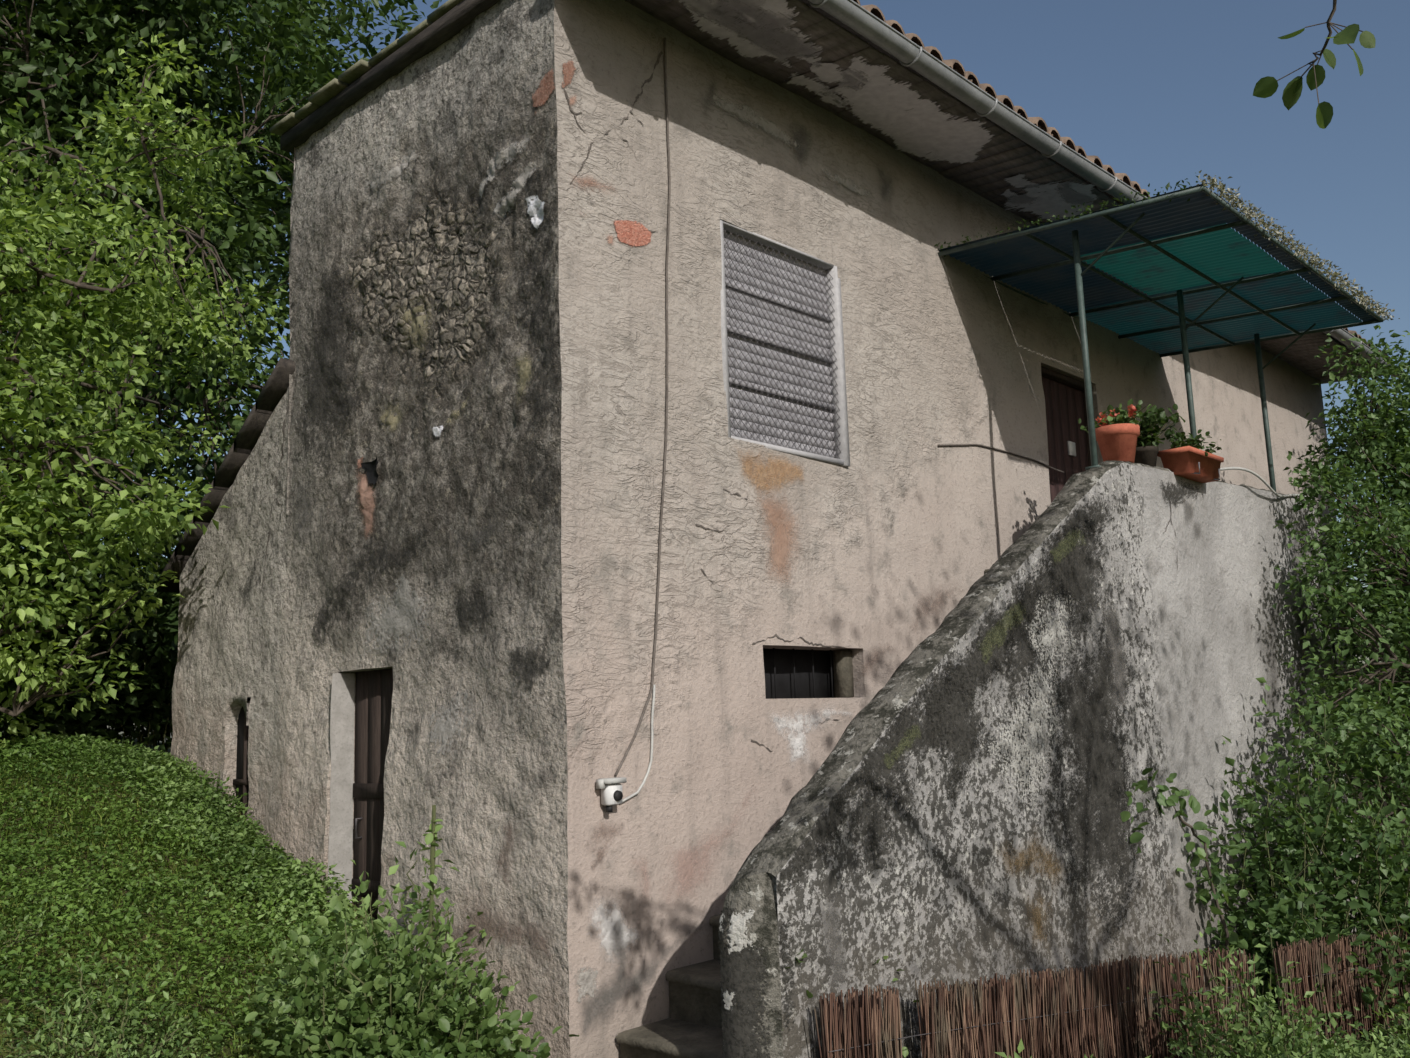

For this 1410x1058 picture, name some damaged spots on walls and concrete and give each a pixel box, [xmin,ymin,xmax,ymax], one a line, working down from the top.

spalling [532,60,576,113]
peeling [678,0,994,164]
water stain [302,264,358,477]
spalling [348,135,544,394]
water stain [512,167,562,506]
spalling [608,220,652,246]
peeling [1001,173,1098,221]
spalling [357,457,378,533]
water stain [312,526,429,645]
water stain [510,636,551,696]
water stain [775,499,1141,950]
water stain [718,908,795,1058]